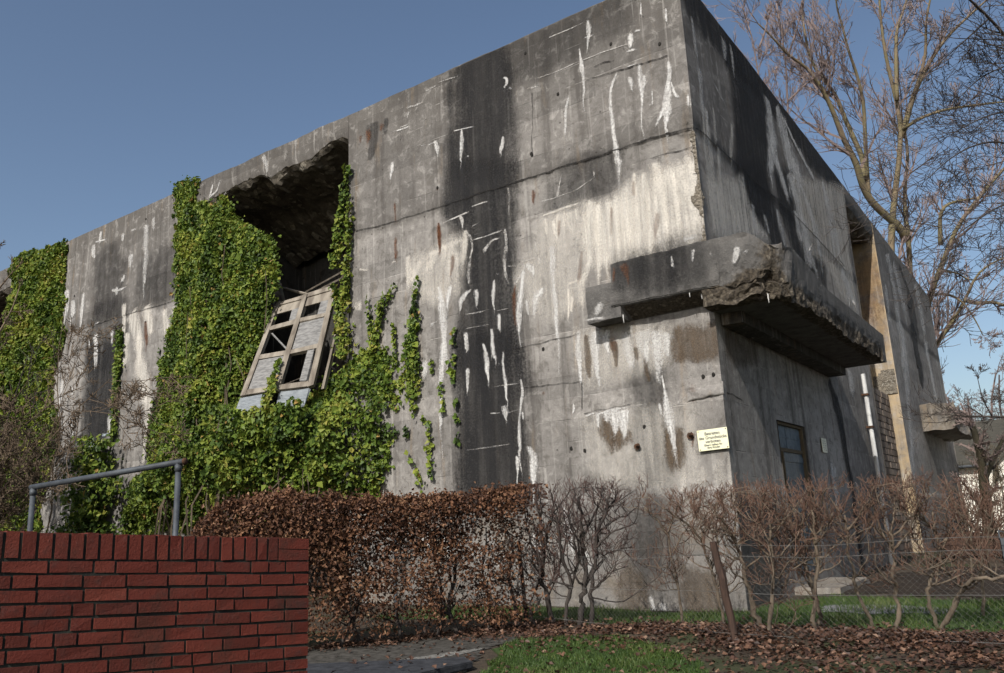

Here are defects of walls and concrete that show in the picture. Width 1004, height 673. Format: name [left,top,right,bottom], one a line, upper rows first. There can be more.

water stain [394,0,857,503]